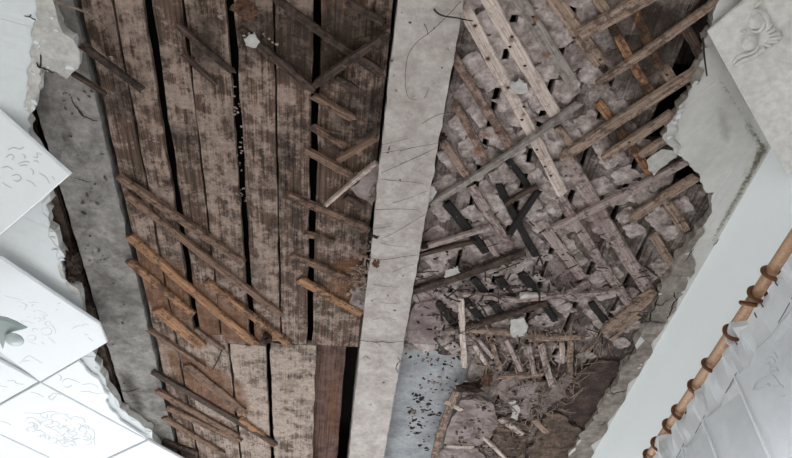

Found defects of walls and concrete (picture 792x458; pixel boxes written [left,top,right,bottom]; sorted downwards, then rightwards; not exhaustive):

peeling [24,0,80,114]
flaking render [42,195,81,297]
flaking render [404,0,710,458]